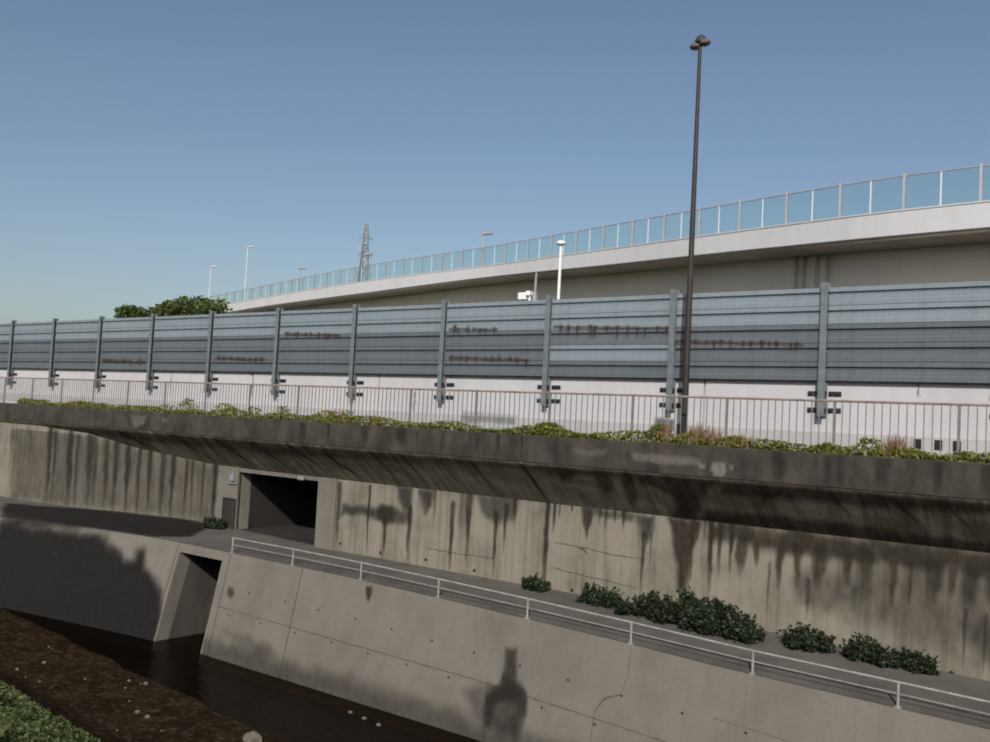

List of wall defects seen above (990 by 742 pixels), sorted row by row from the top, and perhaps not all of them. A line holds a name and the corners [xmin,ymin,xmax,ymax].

water stain [47,427,990,599]
water stain [458,650,527,742]